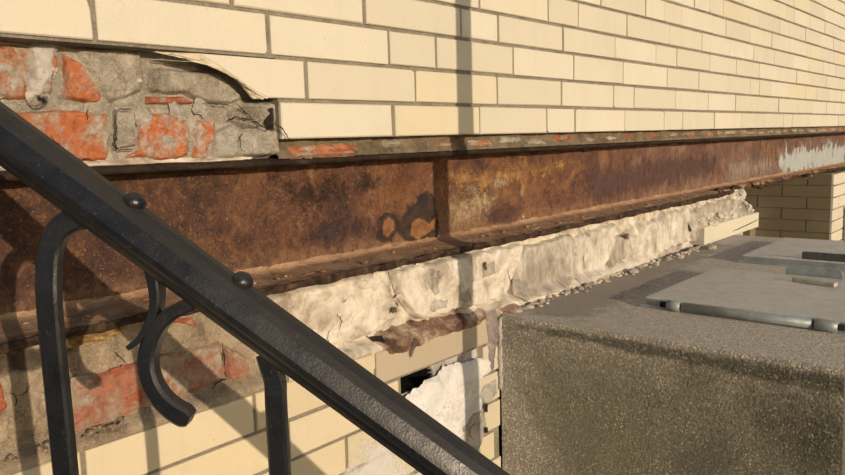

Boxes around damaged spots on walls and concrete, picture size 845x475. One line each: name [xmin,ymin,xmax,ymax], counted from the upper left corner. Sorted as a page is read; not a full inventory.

spalling [0,41,305,166]
rust [376,159,580,242]
rust [714,154,783,194]
peeling [760,138,845,176]
spalling [0,335,51,475]
spalling [66,322,169,457]
spalling [160,312,264,413]
flaking render [267,188,755,450]